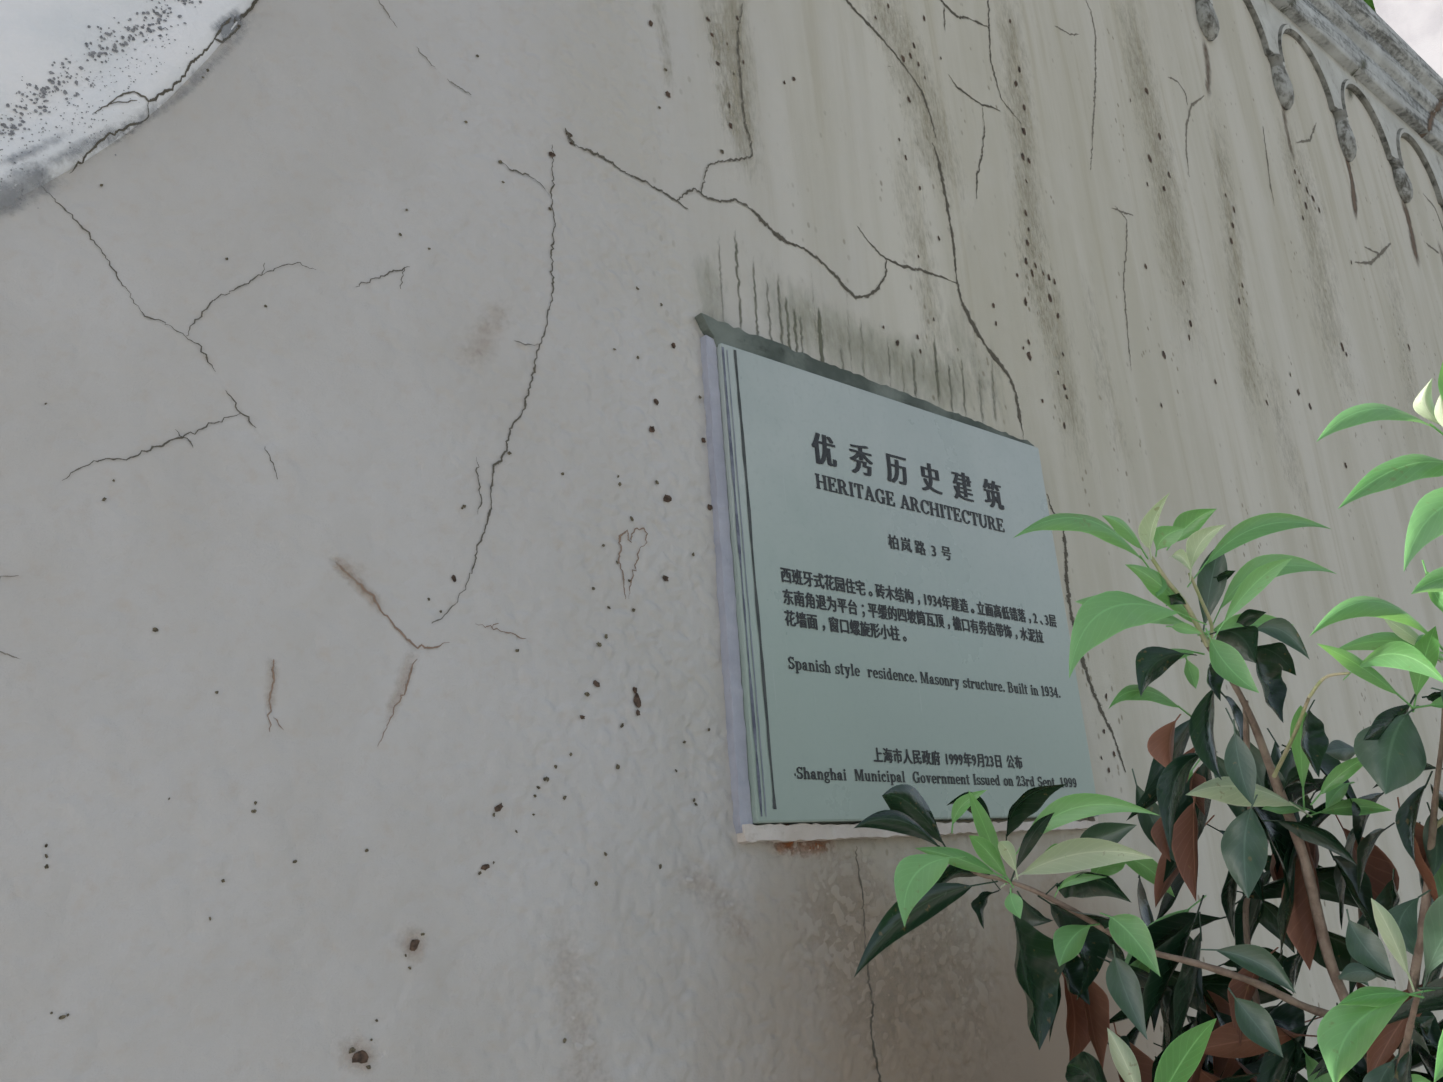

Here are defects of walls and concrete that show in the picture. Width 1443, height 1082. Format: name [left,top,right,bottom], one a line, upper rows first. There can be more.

damp [0,0,202,209]
crack [40,0,316,479]
crack [1055,0,1097,170]
crack [1113,206,1134,366]
crack [1168,77,1204,177]
damp [1346,159,1357,217]
damp [1402,203,1418,260]
damp [1419,98,1443,138]
crack [337,0,1024,745]